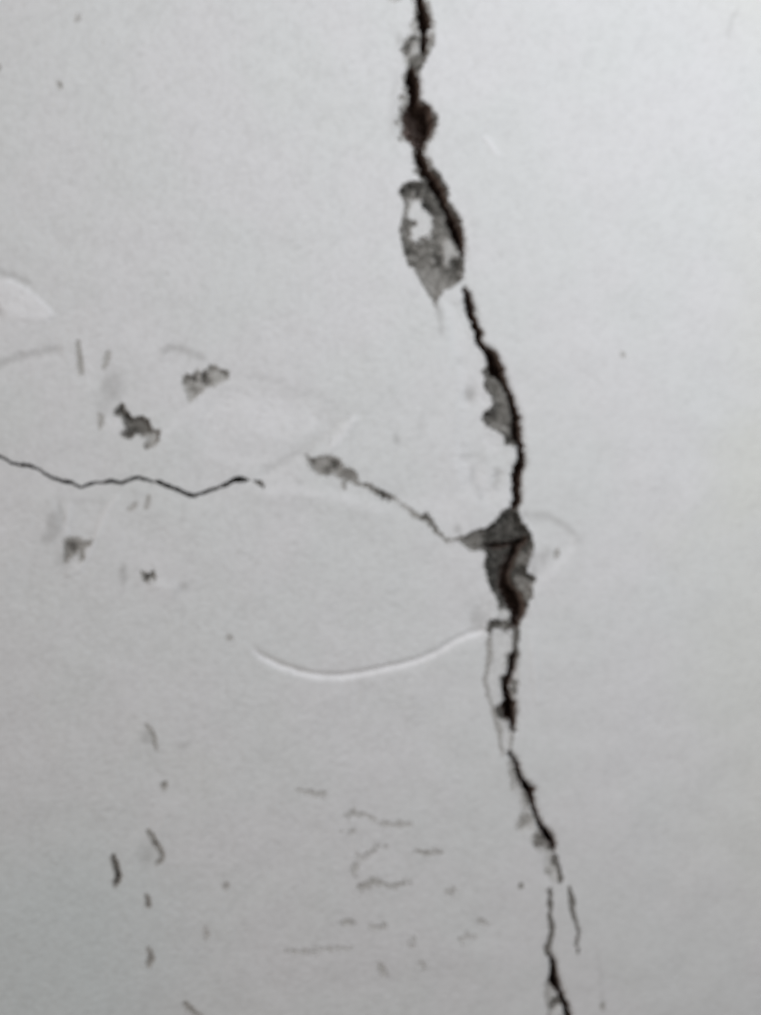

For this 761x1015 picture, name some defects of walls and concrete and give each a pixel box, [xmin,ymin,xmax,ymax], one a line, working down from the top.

crack [415,0,423,52]
crack [400,77,457,251]
peeling [180,364,230,403]
crack [481,350,497,380]
peeling [112,402,161,450]
crack [0,455,265,498]
crack [303,453,526,788]
crack [296,784,327,798]
crack [339,808,444,893]
crack [534,817,581,999]
crack [284,918,429,970]